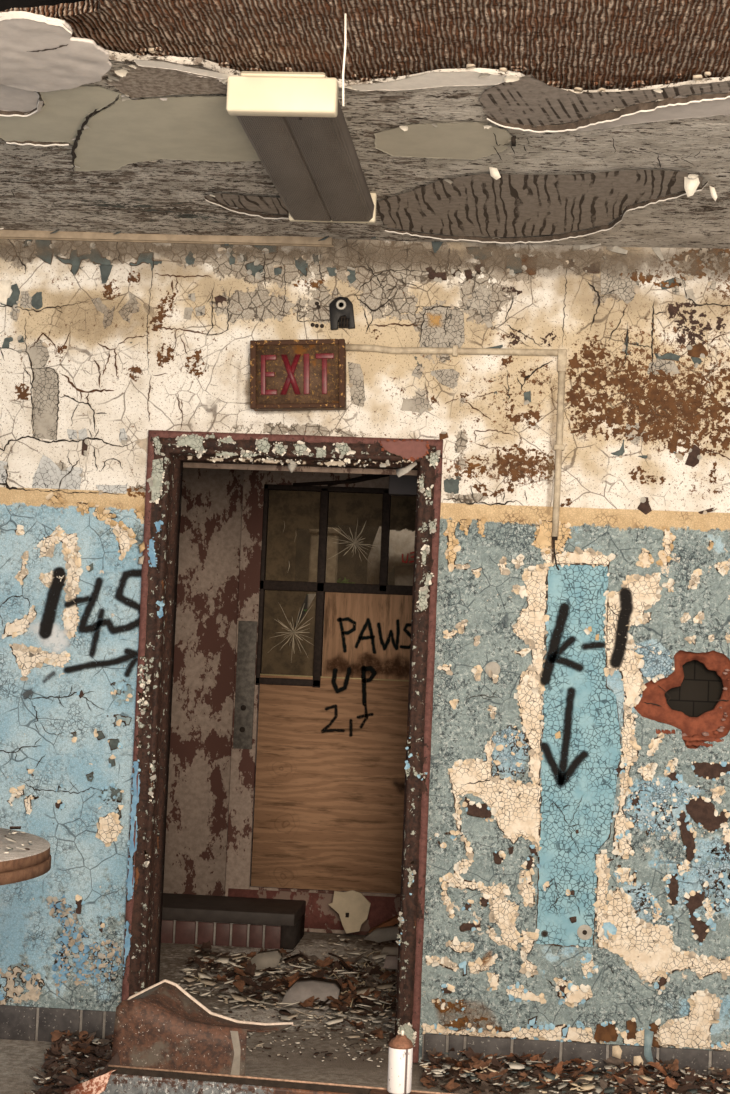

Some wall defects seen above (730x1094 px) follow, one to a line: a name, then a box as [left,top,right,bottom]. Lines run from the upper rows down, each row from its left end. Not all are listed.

flaking render [0,0,730,171]
crack [0,243,233,494]
peeling [175,431,459,500]
crack [319,239,465,347]
crack [444,488,527,506]
rust [501,330,532,381]
peeling [376,170,708,283]
rust [565,335,730,485]
peeling [2,525,93,681]
crack [545,563,621,777]
peeling [178,517,730,1094]
crack [536,796,614,974]